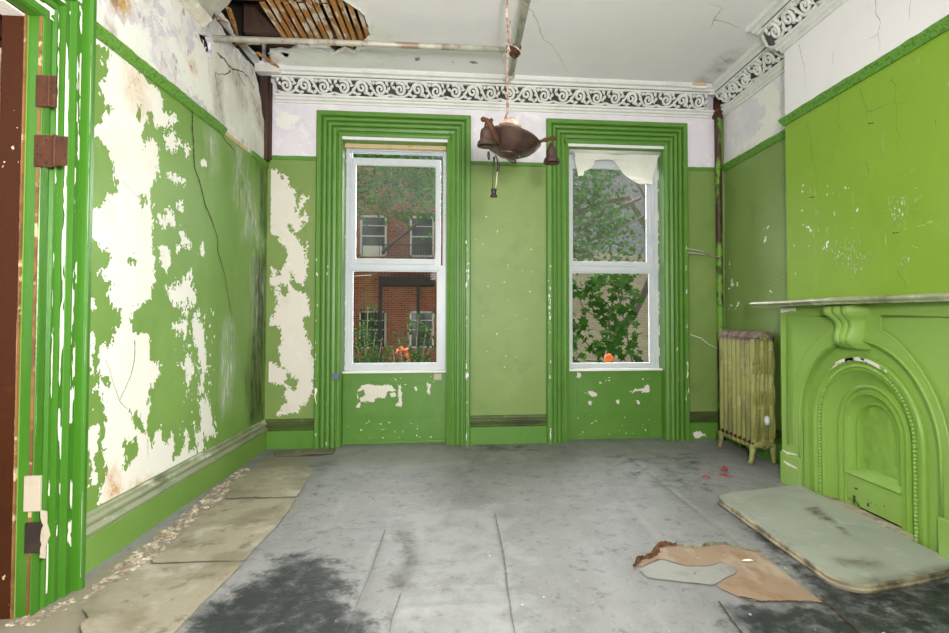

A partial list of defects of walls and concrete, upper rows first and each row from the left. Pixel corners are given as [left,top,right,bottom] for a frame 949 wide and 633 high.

crack [191,111,233,344]
peeling [36,0,420,506]
peeling [356,379,434,408]